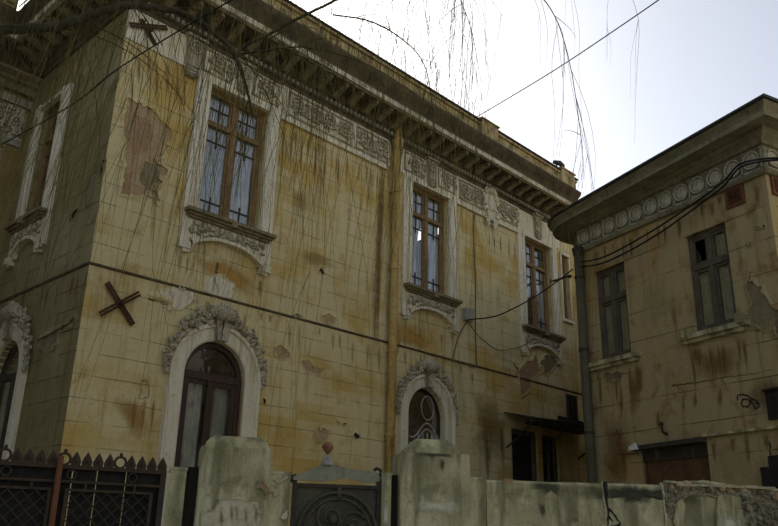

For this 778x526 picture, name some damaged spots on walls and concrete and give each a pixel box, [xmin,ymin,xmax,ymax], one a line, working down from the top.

flaking render [117,94,175,209]
damp [375,194,383,315]
peeling [156,274,237,312]
flaking render [743,273,778,346]
spalling [663,480,778,526]